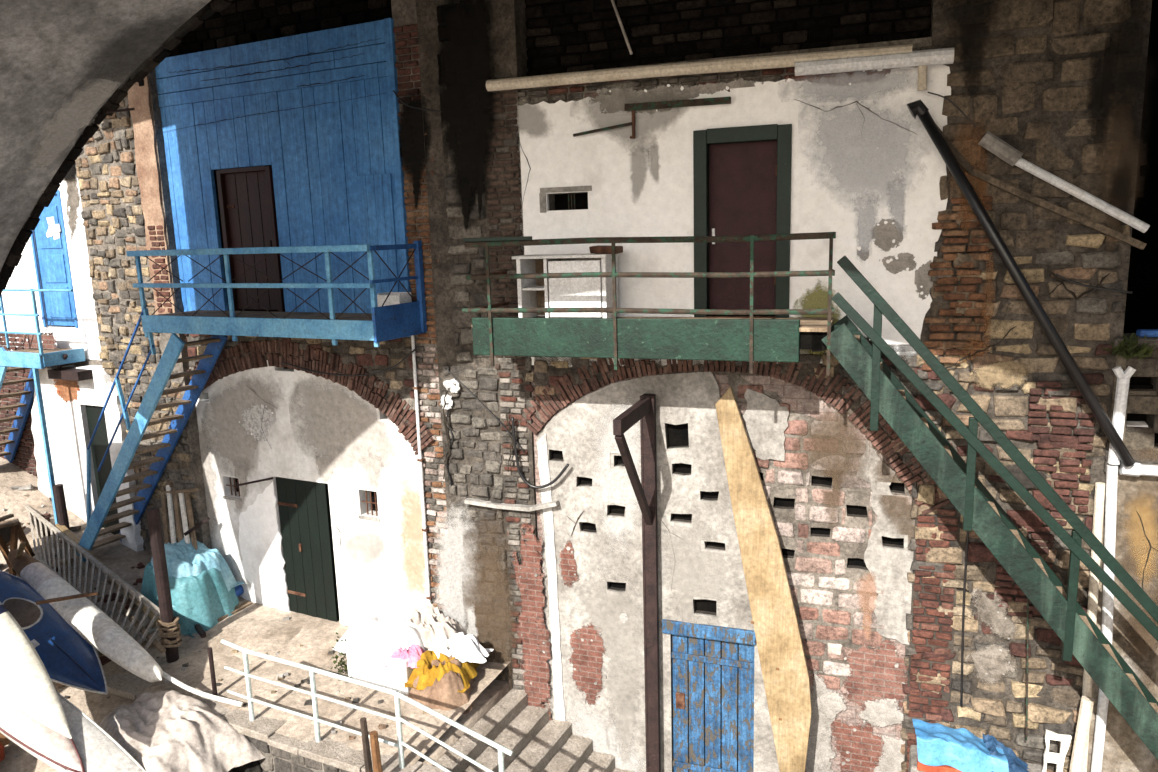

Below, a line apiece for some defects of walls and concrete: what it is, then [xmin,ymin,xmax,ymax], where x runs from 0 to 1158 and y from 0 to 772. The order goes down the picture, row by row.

damp [412,166,420,208]
damp [461,148,485,231]
damp [800,72,910,229]
crack [794,99,918,135]
damp [858,208,875,252]
flaking render [19,332,58,350]
spalling [45,366,80,404]
flaking render [559,541,580,587]
crack [1136,511,1158,589]
flaking render [508,519,552,720]
flaking render [568,622,606,705]
flaking render [826,639,908,772]